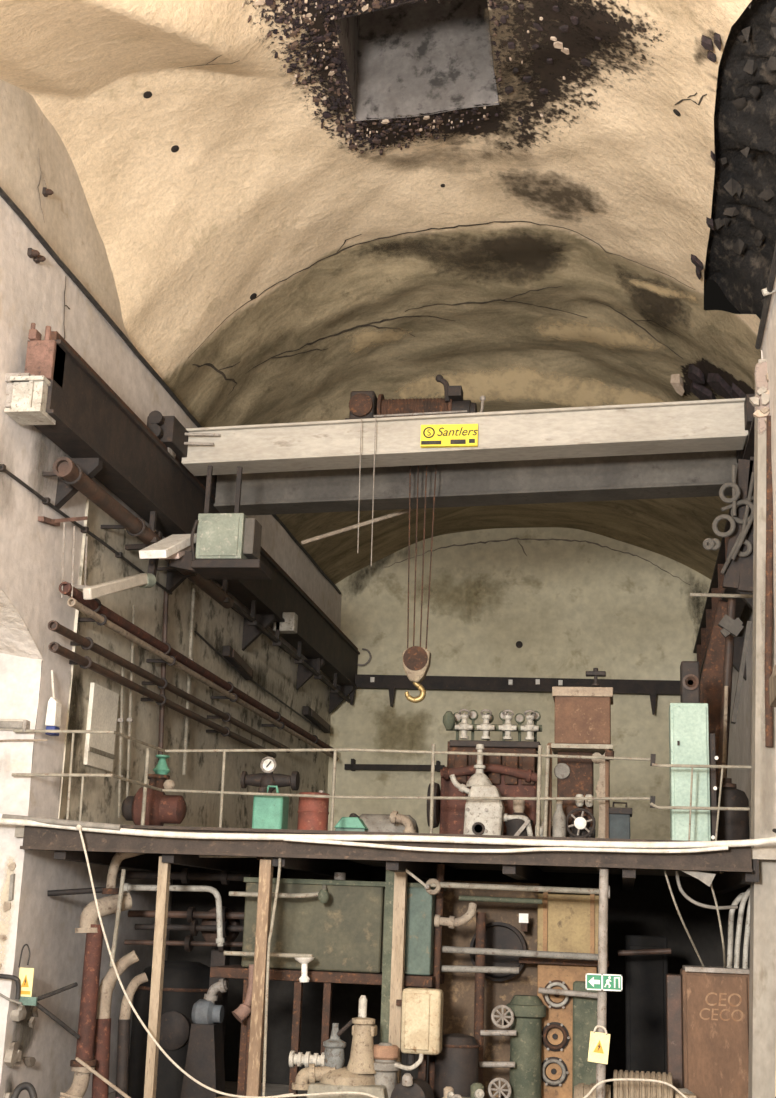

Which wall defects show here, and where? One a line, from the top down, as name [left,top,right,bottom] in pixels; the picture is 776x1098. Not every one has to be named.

peeling [242,0,630,155]
spalling [691,0,776,319]
crack [189,221,695,395]
leakage [485,238,554,267]